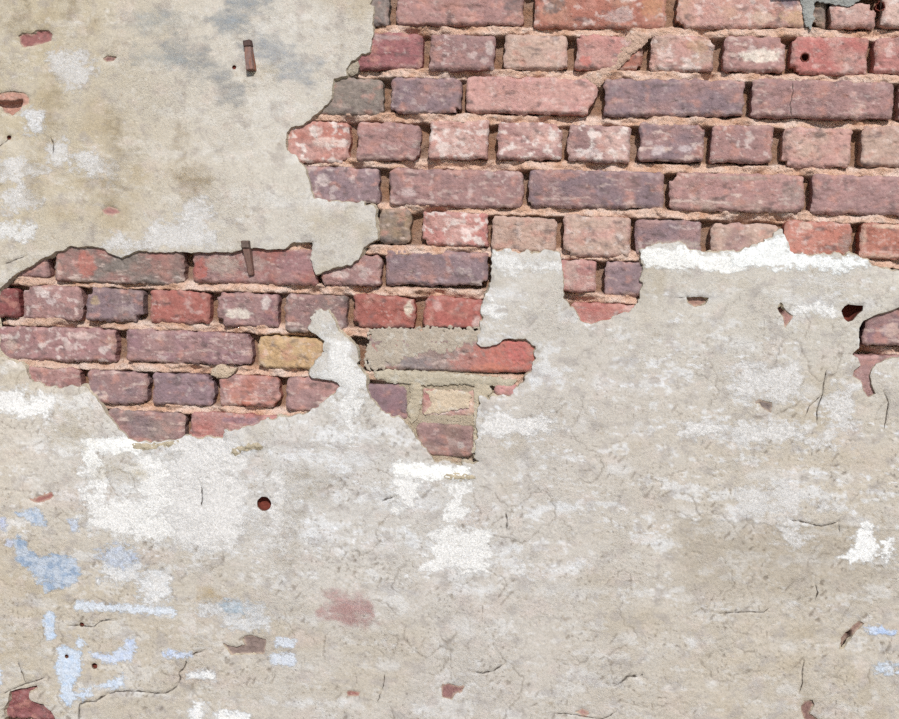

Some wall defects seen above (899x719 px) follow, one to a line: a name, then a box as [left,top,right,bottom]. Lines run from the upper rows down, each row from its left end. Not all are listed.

flaking render [0,0,899,466]
flaking render [3,685,55,719]